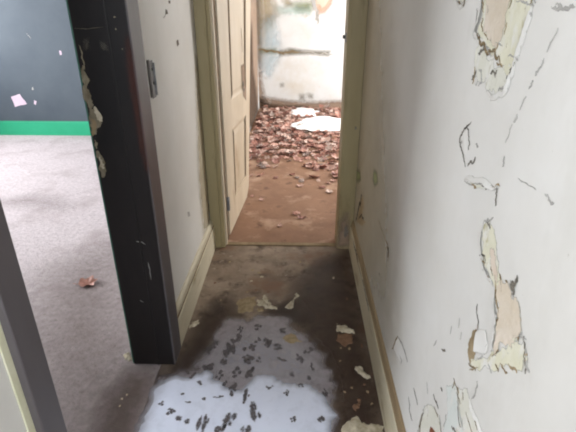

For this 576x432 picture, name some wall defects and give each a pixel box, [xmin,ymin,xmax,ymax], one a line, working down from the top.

peeling [471,0,536,101]
peeling [79,46,107,178]
peeling [464,176,500,206]
damp [176,303,235,374]
damp [266,255,378,432]
spalling [468,217,527,374]
peeling [418,378,482,432]